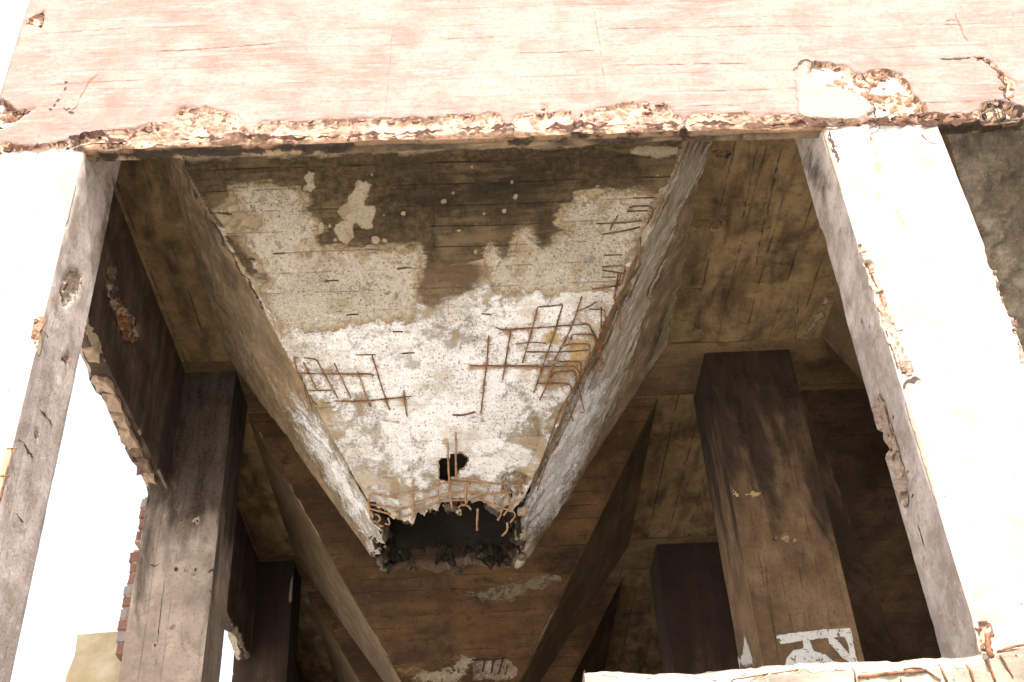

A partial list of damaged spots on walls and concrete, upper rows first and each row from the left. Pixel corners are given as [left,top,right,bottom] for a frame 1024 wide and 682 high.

corrosion [293,362,409,423]
leakage [182,141,682,554]
flaking render [0,56,1024,553]
corrosion [469,312,595,422]